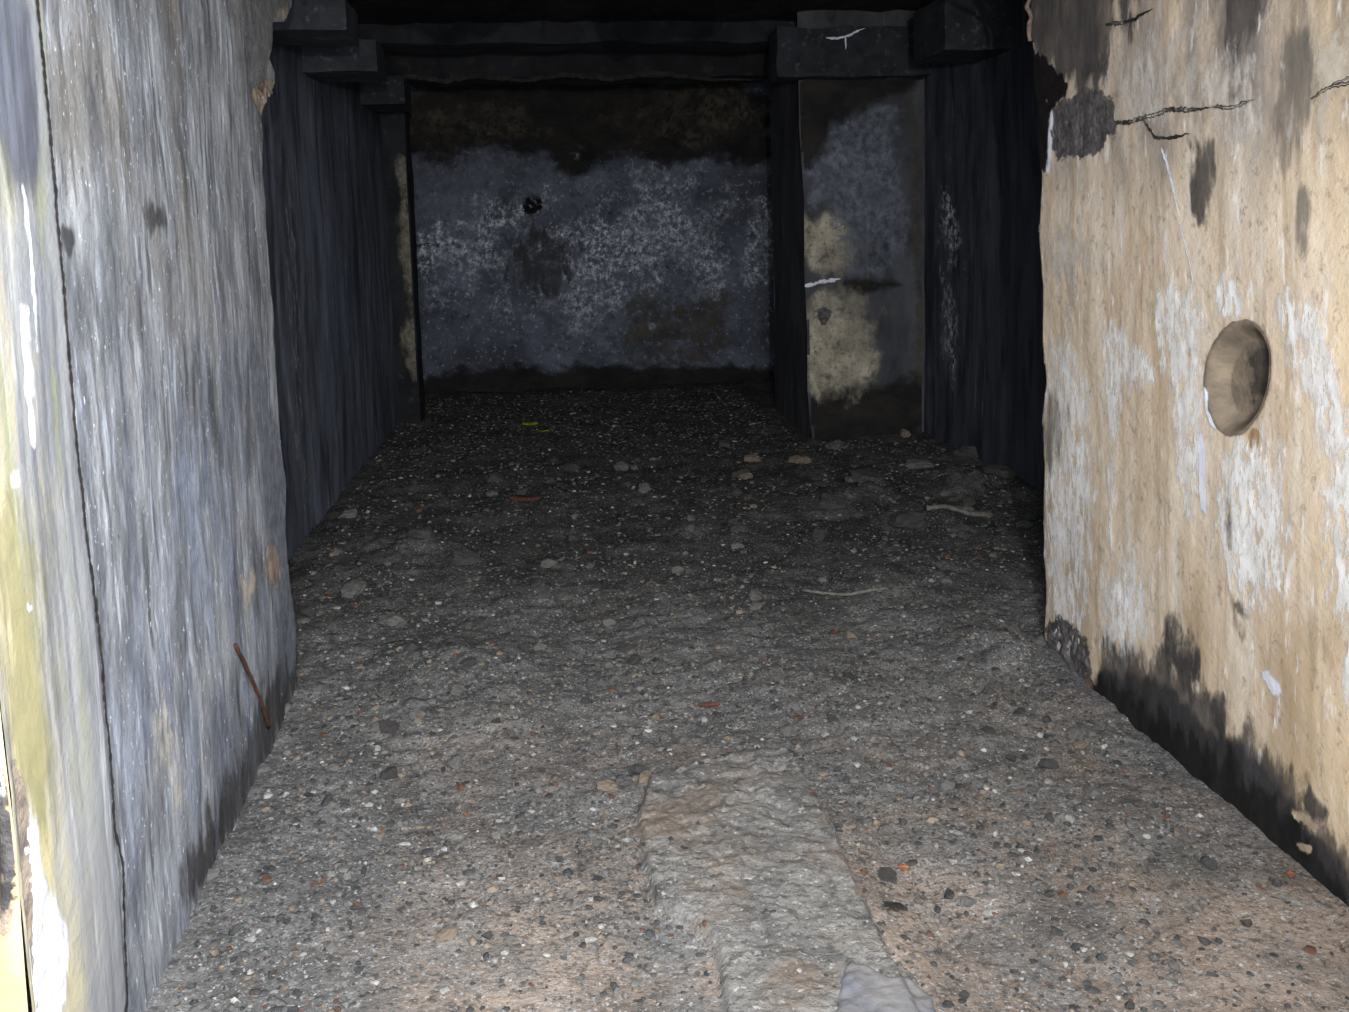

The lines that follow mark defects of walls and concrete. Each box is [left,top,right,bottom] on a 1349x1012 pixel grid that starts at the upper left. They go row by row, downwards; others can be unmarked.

rust [1025,0,1033,42]
leakage [1120,0,1135,41]
leakage [1083,61,1108,93]
crack [1311,76,1349,99]
leakage [1165,616,1201,692]
rust [234,643,271,729]
leakage [1211,693,1226,737]
leakage [1304,790,1327,819]
spalling [0,768,18,936]